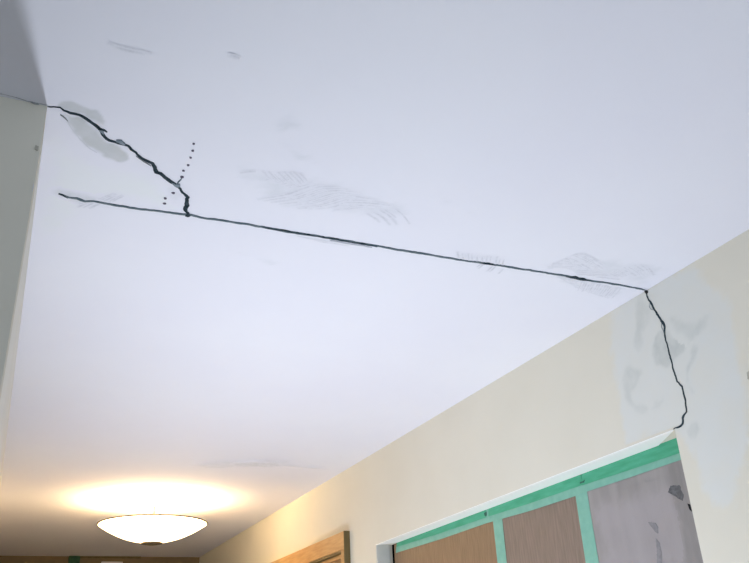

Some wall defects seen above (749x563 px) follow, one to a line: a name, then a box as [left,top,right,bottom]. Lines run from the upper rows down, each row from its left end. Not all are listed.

leakage [55,98,132,165]
crack [0,93,687,429]